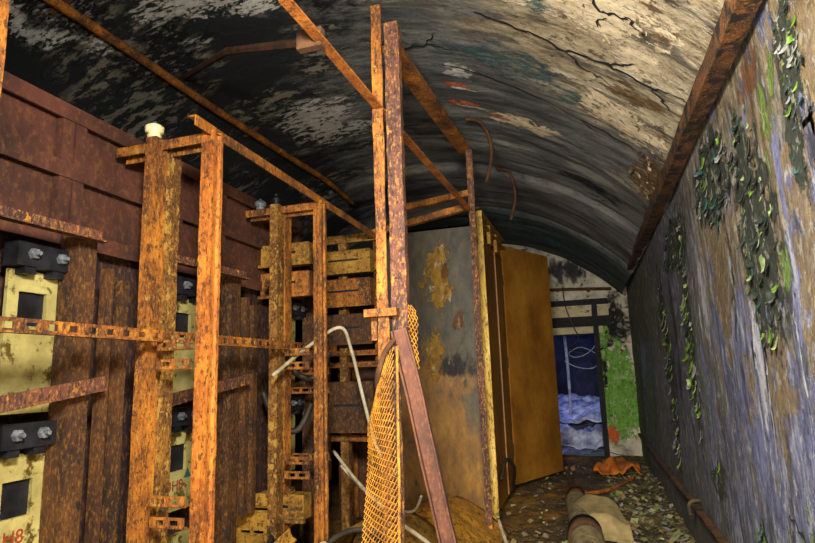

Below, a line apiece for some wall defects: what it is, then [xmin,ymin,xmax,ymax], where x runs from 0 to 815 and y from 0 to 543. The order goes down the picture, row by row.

peeling [8,0,114,56]
peeling [129,0,282,32]
peeling [273,96,373,146]
peeling [442,62,567,139]
crack [404,32,651,165]
crack [474,11,686,112]
peeling [505,0,692,86]
crack [592,0,648,41]
peeling [575,85,669,202]
rust [737,42,760,113]
leakage [745,0,815,534]